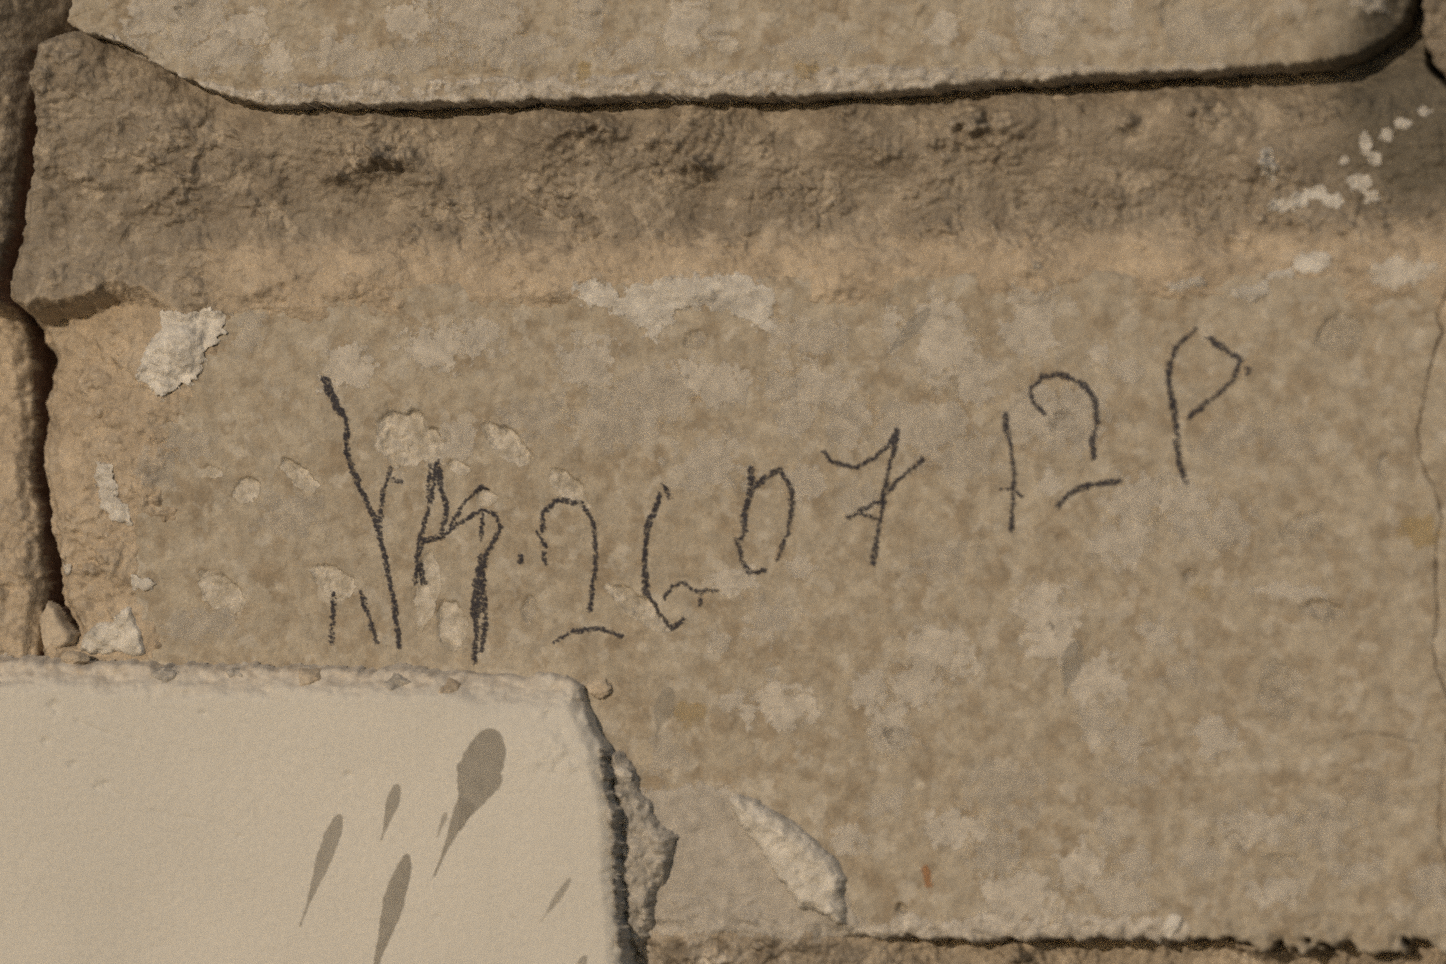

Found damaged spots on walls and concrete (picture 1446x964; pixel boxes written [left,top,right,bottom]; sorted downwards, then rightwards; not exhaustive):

crack [0,99,79,627]
damp [135,307,228,402]
crack [1416,293,1446,695]
damp [307,815,342,906]
damp [382,784,400,835]
damp [374,854,411,964]
damp [434,728,505,875]